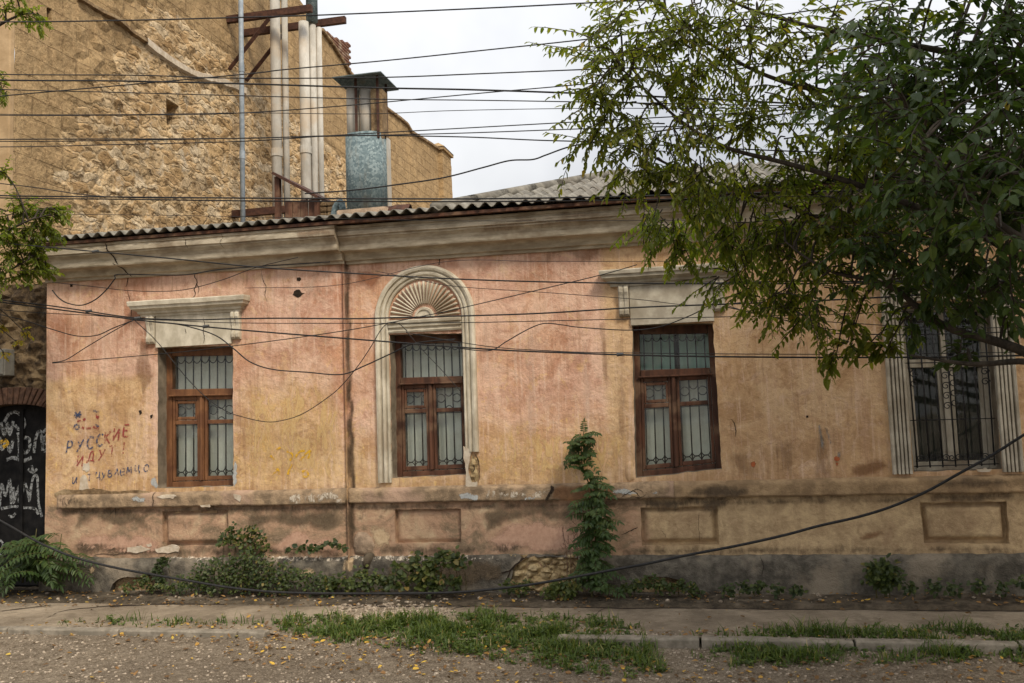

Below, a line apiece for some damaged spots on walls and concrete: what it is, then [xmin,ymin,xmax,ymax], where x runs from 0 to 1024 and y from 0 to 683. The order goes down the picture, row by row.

crack [105,243,132,321]
damp [345,265,355,488]
peeling [459,428,636,500]
damp [854,463,884,474]
damp [60,498,150,524]
peeling [289,492,341,503]
damp [649,486,745,510]
damp [78,544,126,554]
peeling [79,535,180,553]
damp [250,503,366,562]